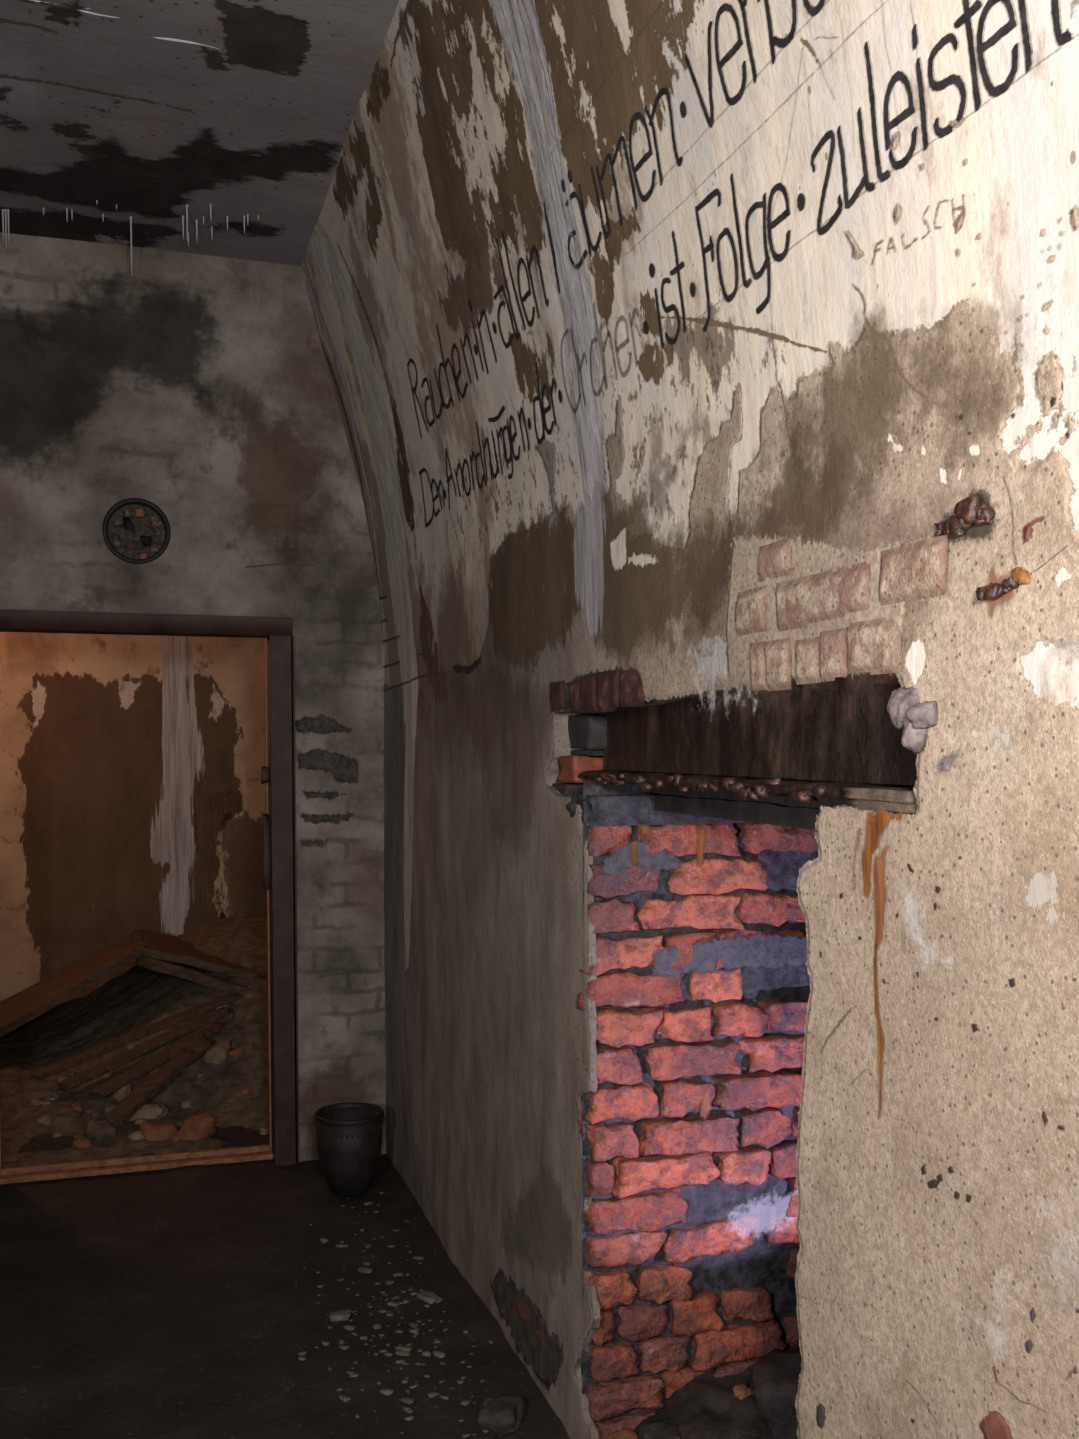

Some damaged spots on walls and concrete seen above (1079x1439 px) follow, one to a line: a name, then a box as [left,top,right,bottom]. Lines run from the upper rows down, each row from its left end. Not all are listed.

water stain [0,61,391,263]
water stain [399,0,902,669]
corrosion [941,490,994,542]
corrosion [988,567,1031,615]
peeling [383,283,1079,1439]
corrosion [853,809,902,1118]